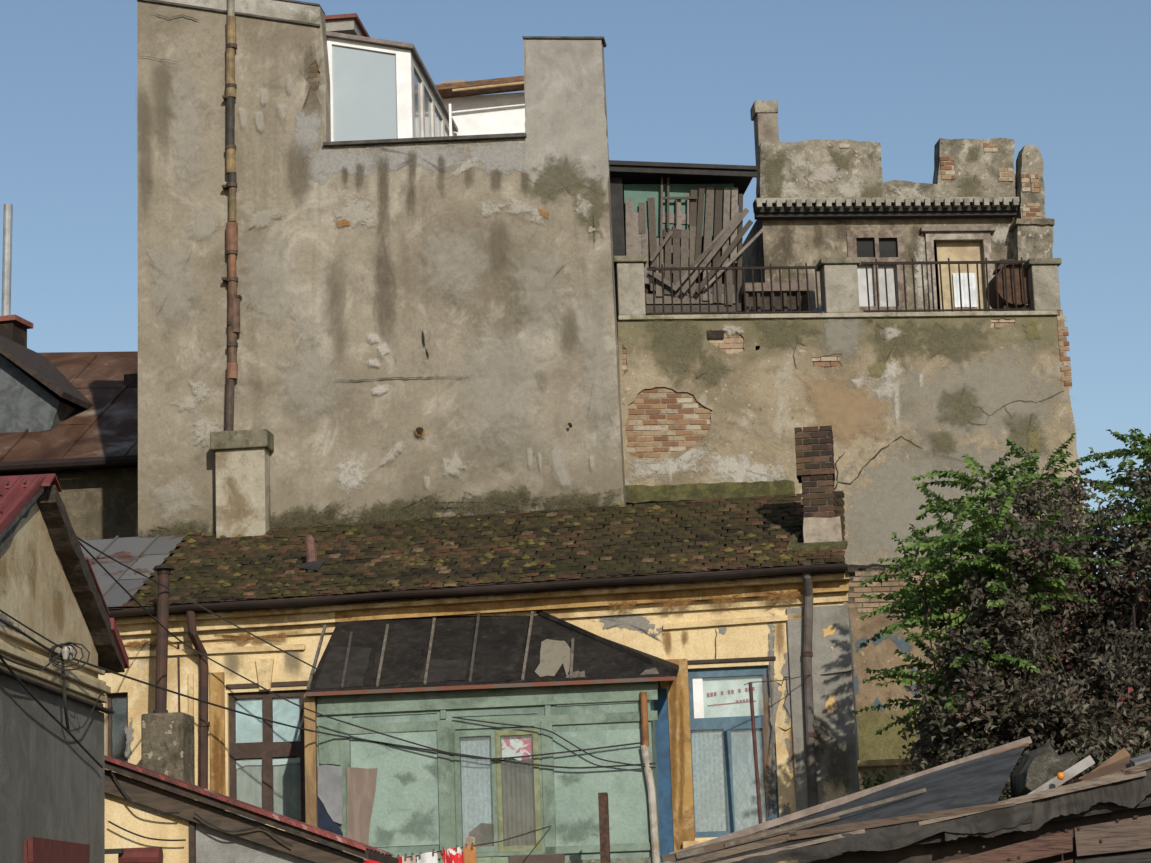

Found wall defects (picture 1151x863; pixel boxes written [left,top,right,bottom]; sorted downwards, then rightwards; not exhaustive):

damp [368,333,389,366]
flaking render [1057,309,1072,391]
flaking render [625,388,712,459]
crack [968,390,1065,425]
crack [834,436,923,490]
peeling [588,614,664,641]
peeling [822,625,836,651]
peeling [825,692,835,714]
peeling [821,777,848,803]